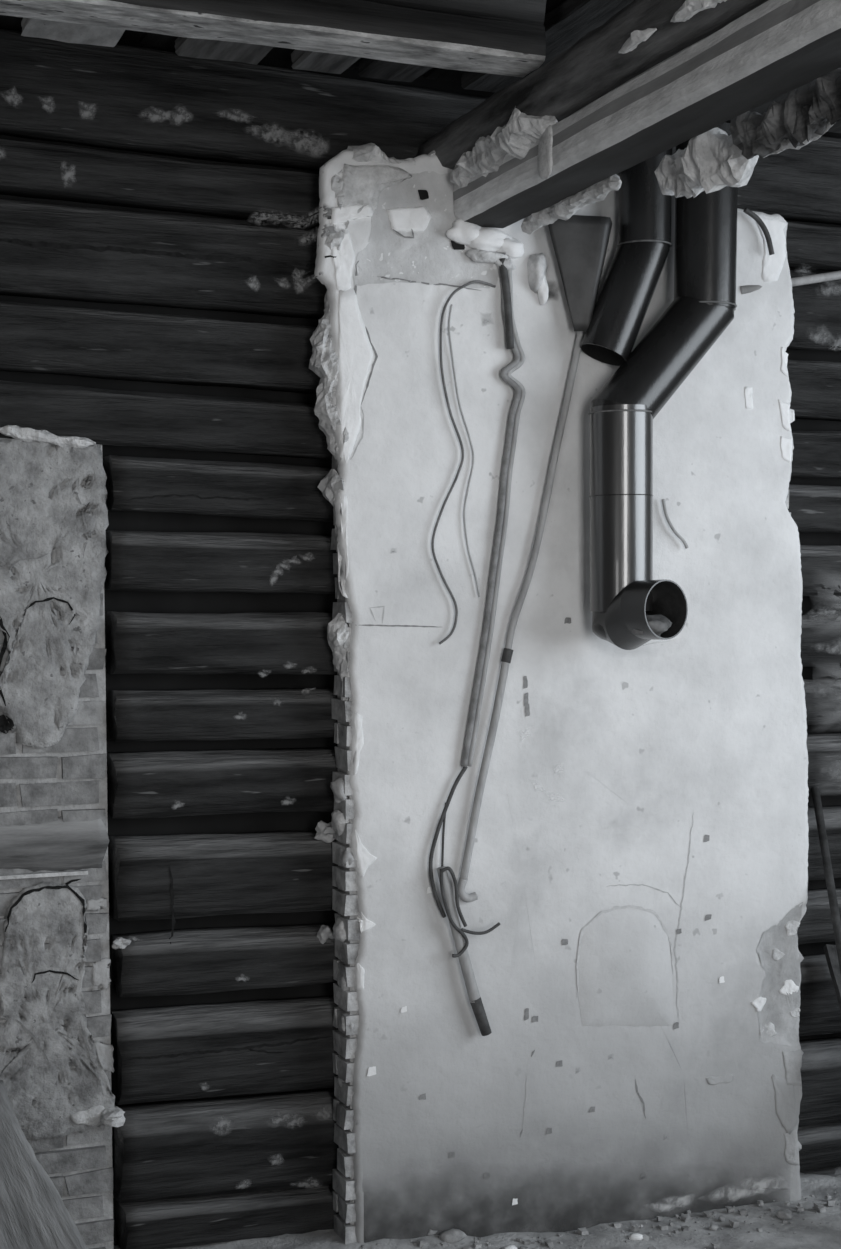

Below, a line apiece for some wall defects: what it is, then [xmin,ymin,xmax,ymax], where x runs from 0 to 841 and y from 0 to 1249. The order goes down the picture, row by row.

peeling [309,143,501,598]
spalling [0,425,96,448]
crack [24,597,75,624]
spalling [0,617,10,666]
spalling [327,613,377,877]
spalling [86,897,107,911]
crack [5,879,87,982]
spalling [333,912,376,942]
spalling [90,958,111,991]
spalling [751,902,804,1165]
spalling [93,1040,115,1073]
spalling [70,1105,105,1126]